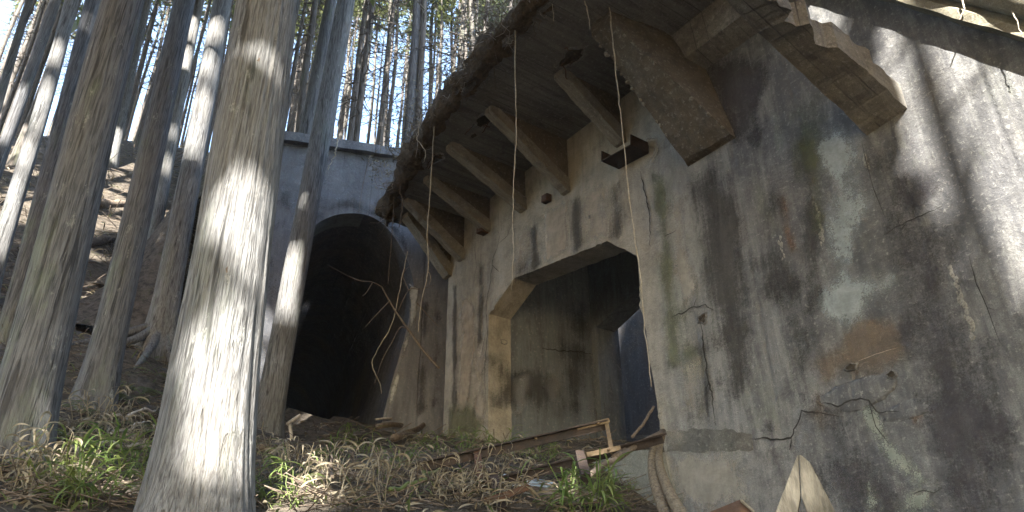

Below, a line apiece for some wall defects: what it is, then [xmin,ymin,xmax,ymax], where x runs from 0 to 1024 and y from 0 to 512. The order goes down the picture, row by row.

water stain [707,58,768,144]
crack [862,144,942,235]
crack [673,298,716,425]
water stain [673,129,1017,512]
crack [969,257,999,340]
crack [755,398,898,450]